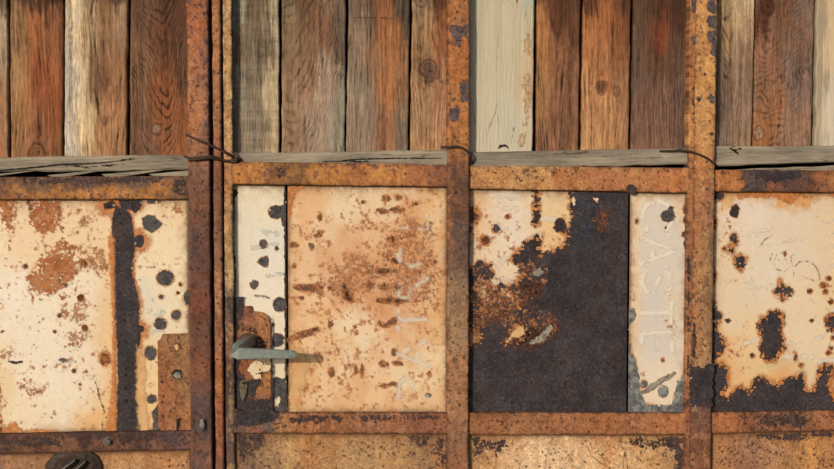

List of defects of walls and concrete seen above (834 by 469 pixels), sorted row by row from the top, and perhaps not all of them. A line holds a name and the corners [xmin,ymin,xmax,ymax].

rust [0,199,18,251]
rust [293,194,440,310]
spalling [469,205,482,226]
spalling [479,214,511,246]
spalling [553,218,567,235]
rust [26,199,150,431]
peeling [511,326,524,338]
peeling [530,325,553,344]
rust [287,320,333,412]
rust [379,348,403,367]
peeling [628,343,696,412]
rust [0,388,58,433]